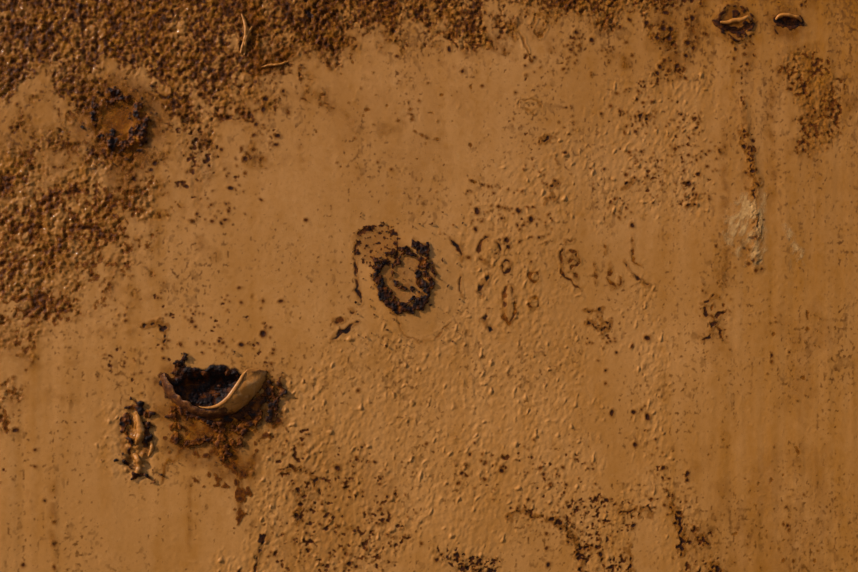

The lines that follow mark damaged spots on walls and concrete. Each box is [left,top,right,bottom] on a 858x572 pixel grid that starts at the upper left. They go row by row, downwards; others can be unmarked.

rust [0,0,677,371]
rust [0,379,23,434]
peeling [114,294,423,572]
spalling [435,547,500,572]